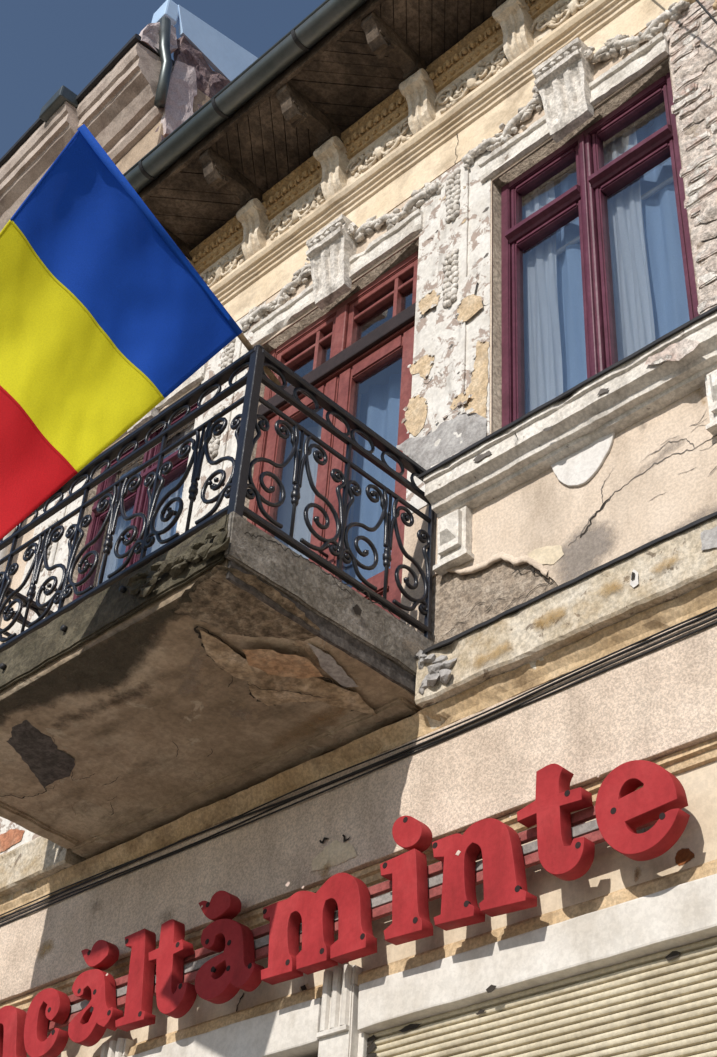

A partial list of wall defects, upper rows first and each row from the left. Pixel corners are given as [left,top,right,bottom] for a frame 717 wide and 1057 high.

flaking render [658,0,717,315]
peeling [417,289,440,314]
peeling [454,294,483,323]
peeling [442,339,489,418]
crack [569,413,717,544]
peeling [127,513,377,716]
flaking render [430,545,564,644]
spalling [7,720,75,789]
peeling [0,817,40,855]
rust [675,848,694,866]